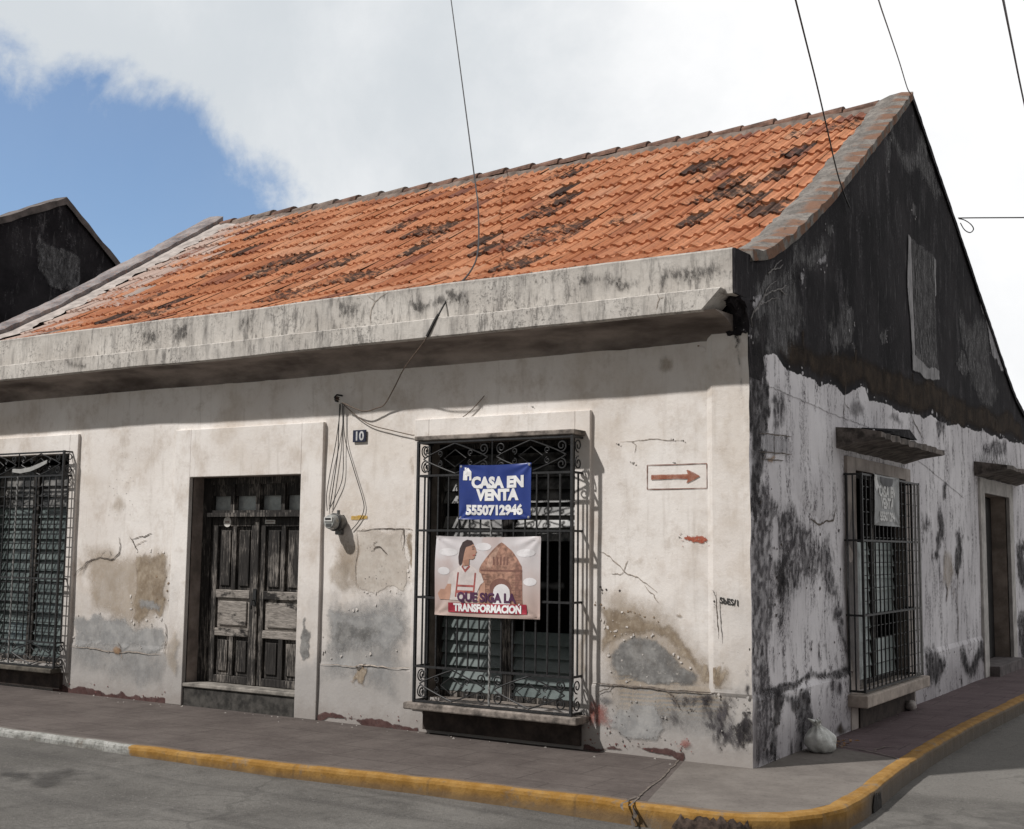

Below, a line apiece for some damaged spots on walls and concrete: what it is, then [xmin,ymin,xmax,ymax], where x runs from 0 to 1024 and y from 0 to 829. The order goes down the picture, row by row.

leakage [412,289,468,311]
leakage [661,267,716,280]
peeling [724,223,1024,498]
crack [74,533,151,576]
flaking render [130,549,170,627]
flaking render [356,527,410,606]
crack [602,552,658,602]
leakage [579,314,863,765]
leakage [923,483,969,584]
leakage [1016,540,1024,589]
leakage [331,602,406,685]
leakage [925,641,984,696]